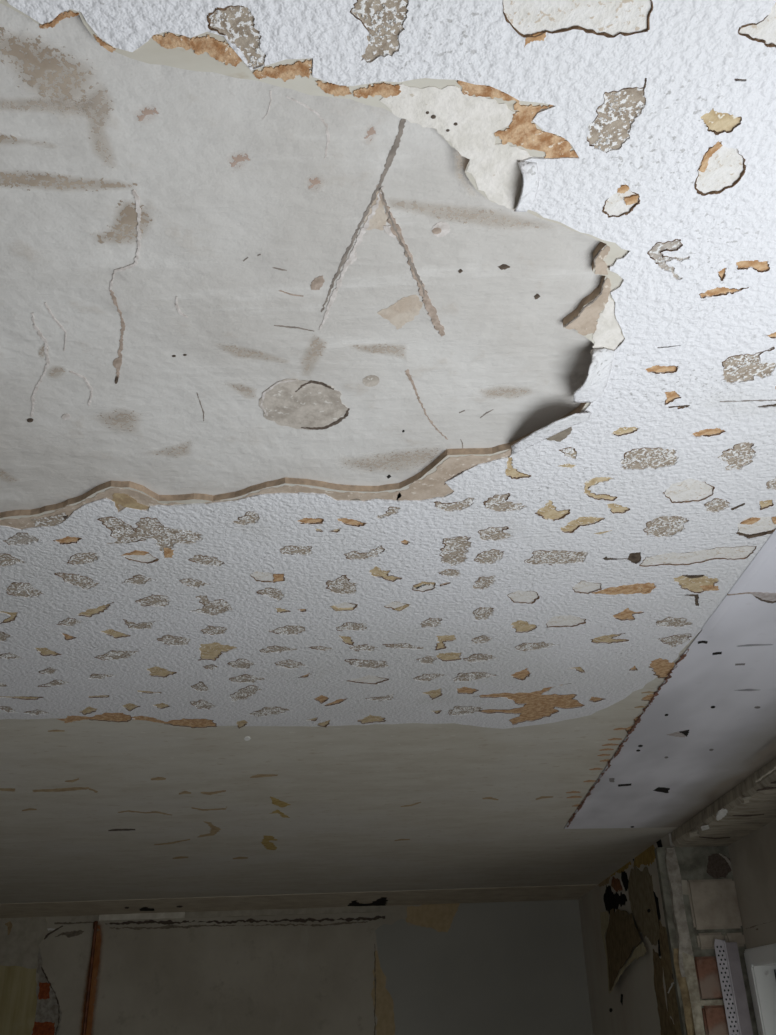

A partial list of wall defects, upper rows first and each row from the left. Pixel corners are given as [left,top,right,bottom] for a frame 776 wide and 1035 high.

peeling [380,84,533,209]
crack [319,119,445,337]
peeling [602,184,640,218]
peeling [590,296,624,356]
spalling [259,378,350,430]
spalling [547,427,572,442]
peeling [298,518,367,533]
peeling [535,477,630,534]
peeling [639,500,776,593]
peeling [573,581,657,595]
peeling [48,690,217,732]
peeling [457,668,604,725]